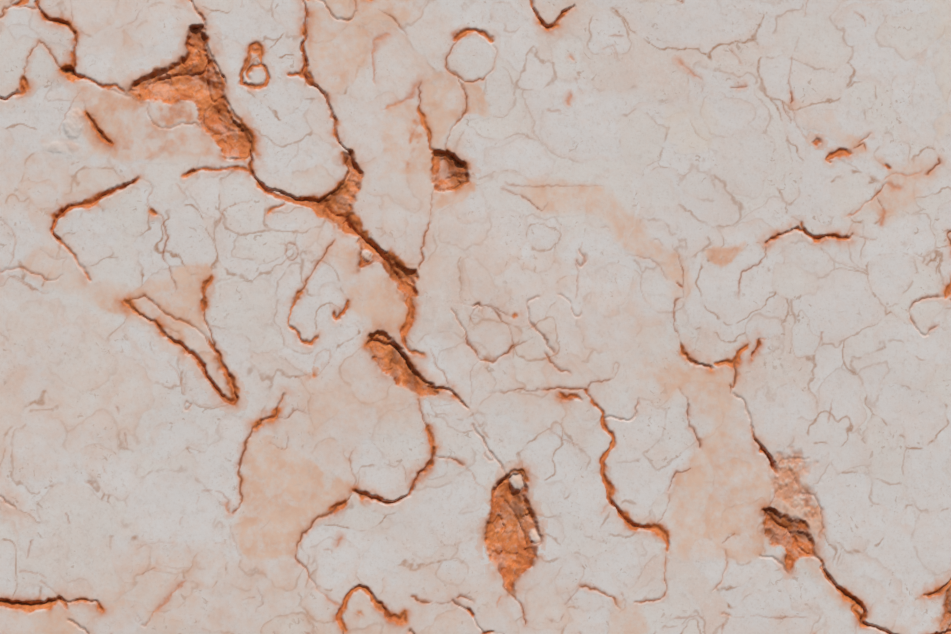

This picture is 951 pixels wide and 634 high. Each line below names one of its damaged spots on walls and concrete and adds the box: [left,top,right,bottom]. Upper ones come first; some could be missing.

spalling [118,12,270,170]
crack [232,0,502,162]
spalling [419,139,481,205]
crack [736,0,947,300]
crack [0,0,355,559]
spalling [354,317,442,400]
crack [291,225,817,634]
crack [0,539,193,634]
spalling [475,457,548,596]
spalling [748,446,829,580]
crack [757,548,951,634]
spalling [930,591,951,634]